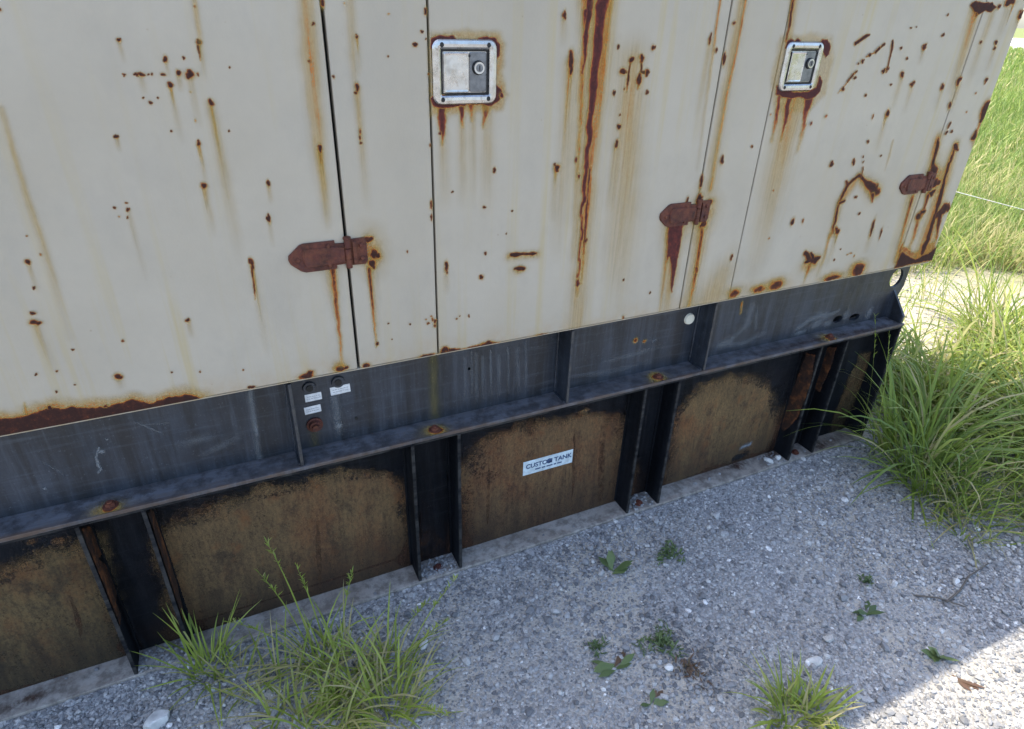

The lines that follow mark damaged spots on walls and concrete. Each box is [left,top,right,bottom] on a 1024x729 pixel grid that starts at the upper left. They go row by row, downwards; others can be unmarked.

corrosion [122,39,202,104]
corrosion [412,30,504,147]
corrosion [567,0,656,296]
corrosion [685,0,747,304]
corrosion [770,76,823,164]
corrosion [821,39,831,58]
corrosion [894,122,959,269]
corrosion [964,0,1024,50]
corrosion [649,226,683,297]
corrosion [330,269,349,372]
corrosion [0,390,203,436]
corrosion [781,336,837,432]